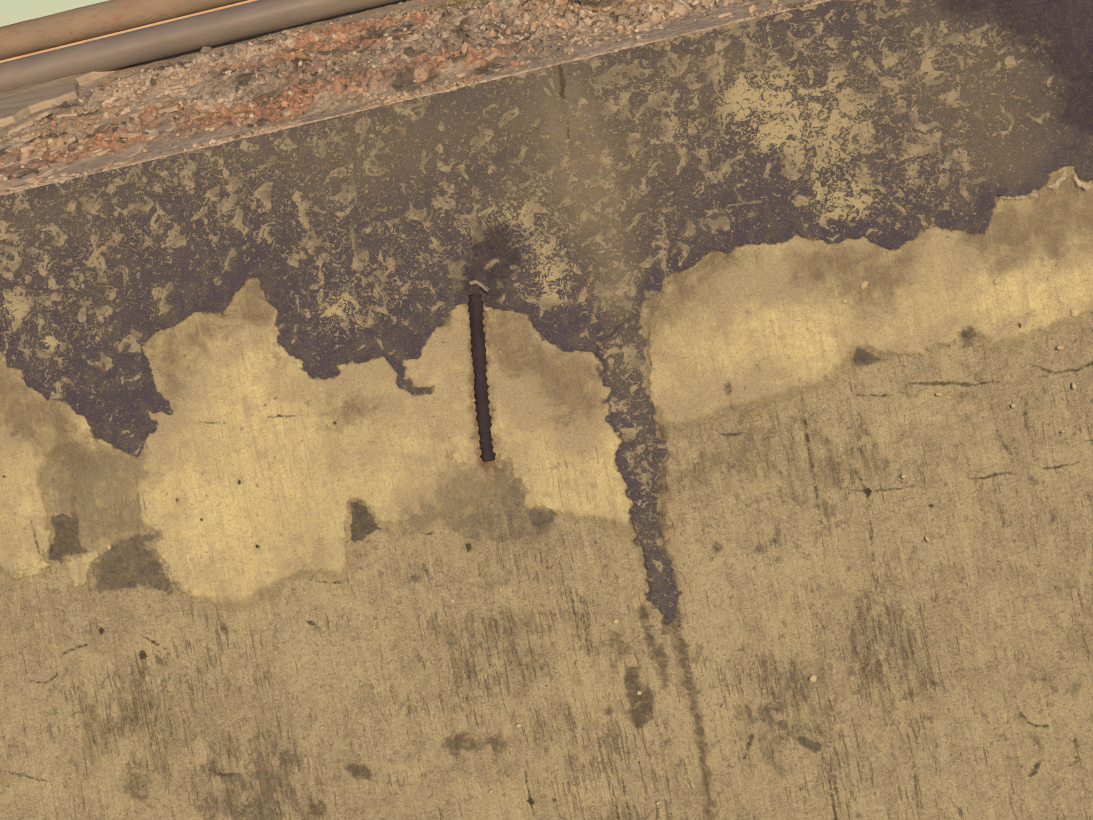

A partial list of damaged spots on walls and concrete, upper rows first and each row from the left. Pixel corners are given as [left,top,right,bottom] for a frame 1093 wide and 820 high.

leakage [950,0,1093,126]
peeling [0,225,638,606]
leakage [490,315,715,820]
peeling [638,165,1093,431]